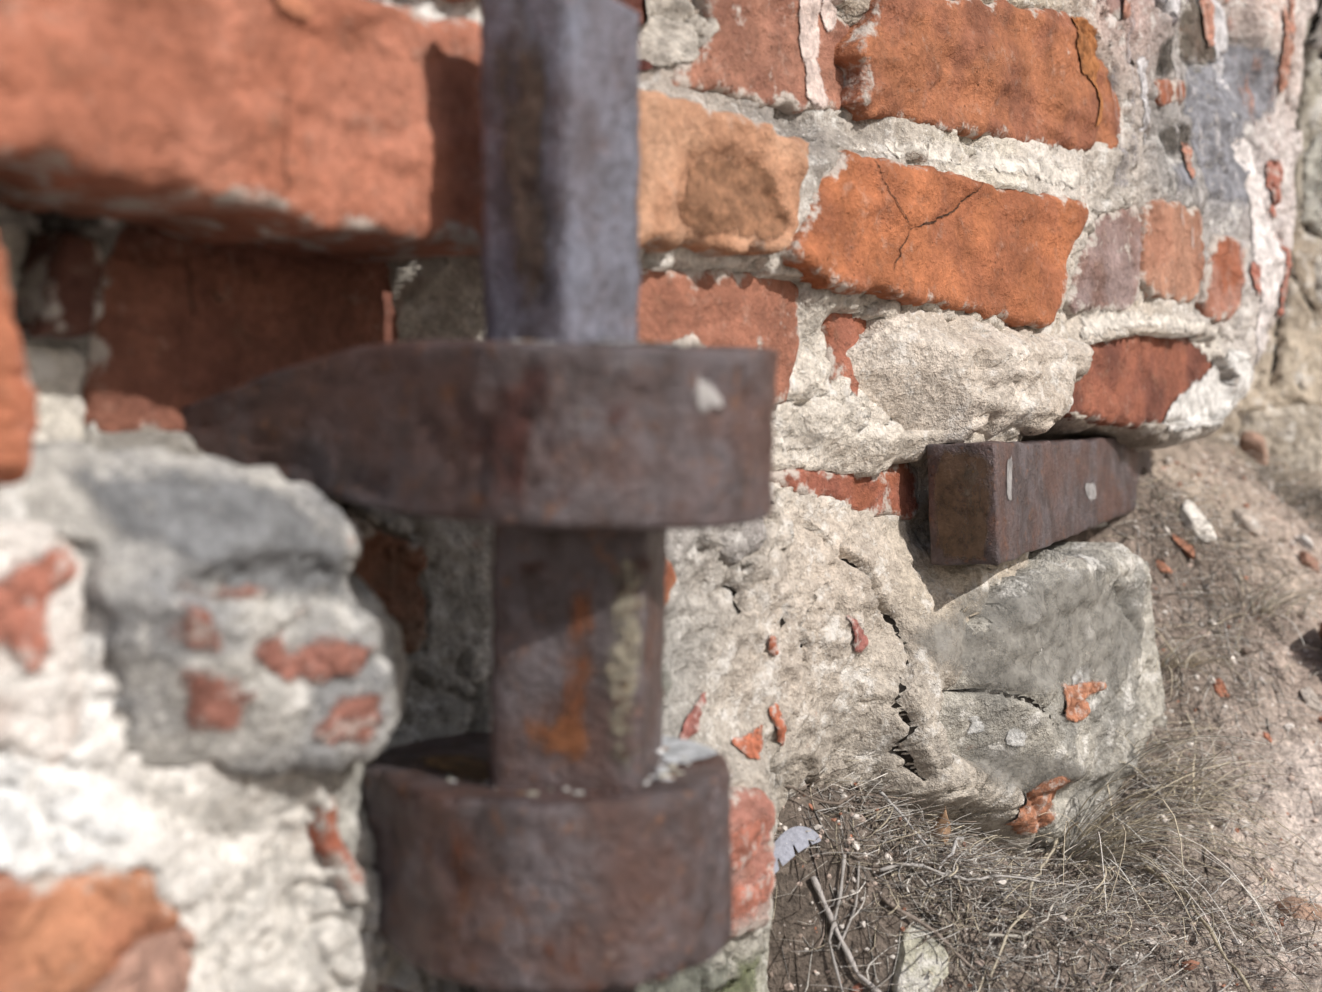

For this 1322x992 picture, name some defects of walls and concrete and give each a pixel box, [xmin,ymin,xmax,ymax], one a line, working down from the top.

crack [868,157,982,267]
crack [881,613,927,781]
crack [942,688,1054,725]
rust [527,714,586,761]
rust [419,754,491,779]